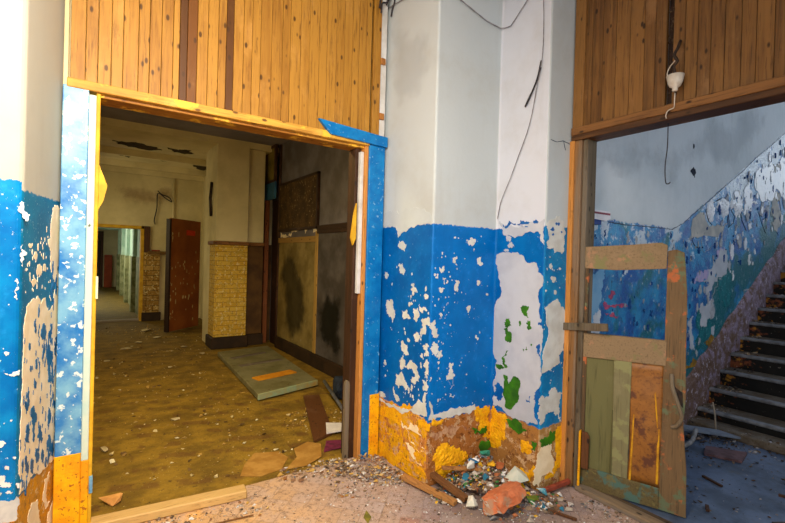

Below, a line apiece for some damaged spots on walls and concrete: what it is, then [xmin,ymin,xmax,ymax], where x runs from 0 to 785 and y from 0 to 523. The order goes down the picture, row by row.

peeling [6,201,30,221]
peeling [0,205,60,523]
spalling [112,140,193,158]
peeling [378,207,566,487]
peeling [591,269,618,333]
peeling [667,140,785,369]